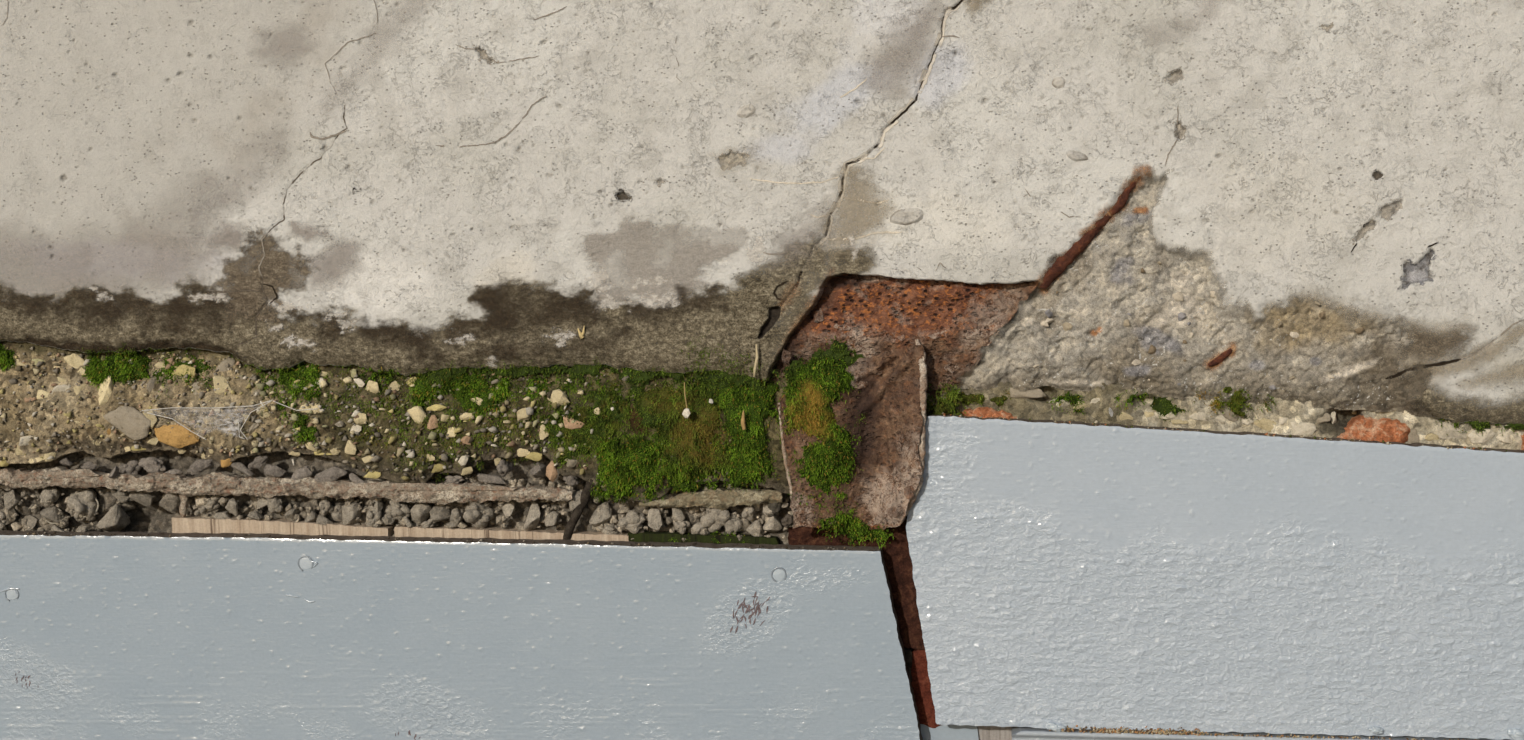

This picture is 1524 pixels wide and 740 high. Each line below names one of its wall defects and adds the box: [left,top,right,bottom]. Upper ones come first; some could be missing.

crack [217,1,378,345]
damp [0,167,886,382]
crack [750,0,963,339]
spalling [928,173,1436,418]
damp [1294,300,1524,424]